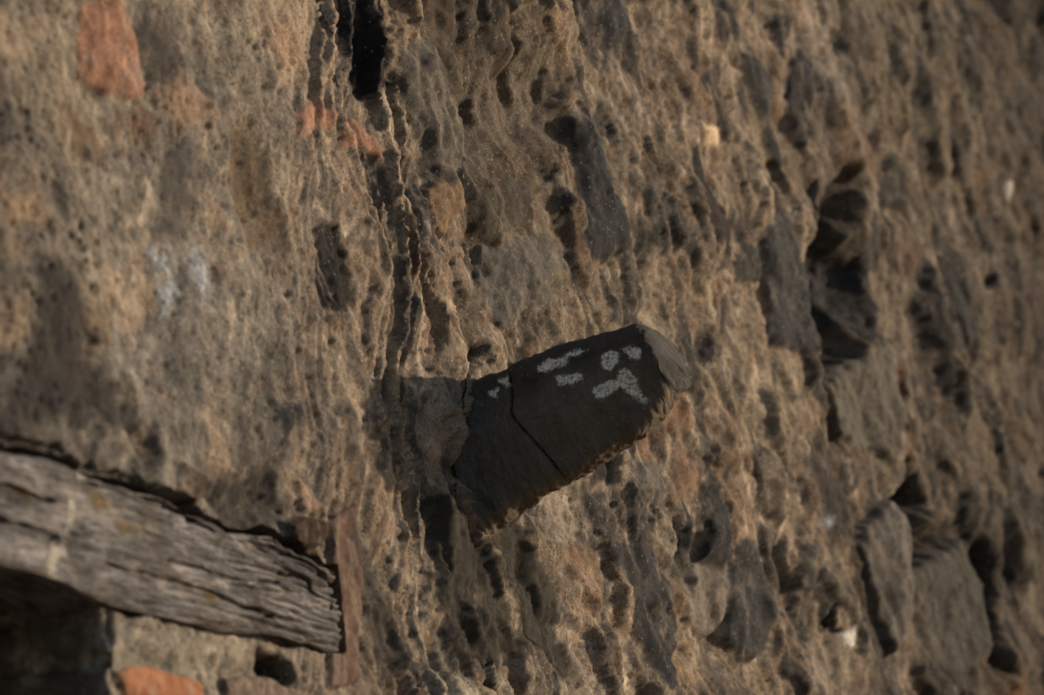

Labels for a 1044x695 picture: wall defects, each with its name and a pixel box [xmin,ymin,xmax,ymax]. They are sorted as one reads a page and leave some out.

crack [510,375,564,475]